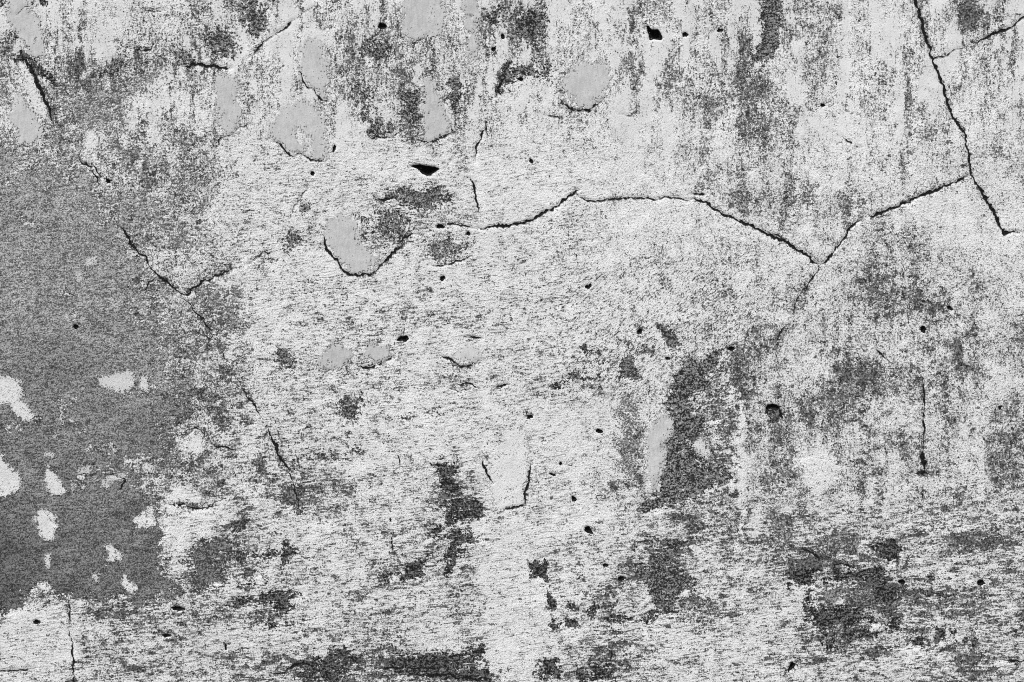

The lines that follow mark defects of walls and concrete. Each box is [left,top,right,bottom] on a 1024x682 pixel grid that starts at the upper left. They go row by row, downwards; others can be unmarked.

water stain [0,66,18,145]
crack [21,57,53,123]
spalling [0,0,304,631]
water stain [44,57,272,436]
crack [116,224,299,509]
peeling [267,36,332,163]
spalling [331,390,371,427]
peeling [323,180,476,277]
peeling [352,0,613,146]
crack [445,0,1024,341]